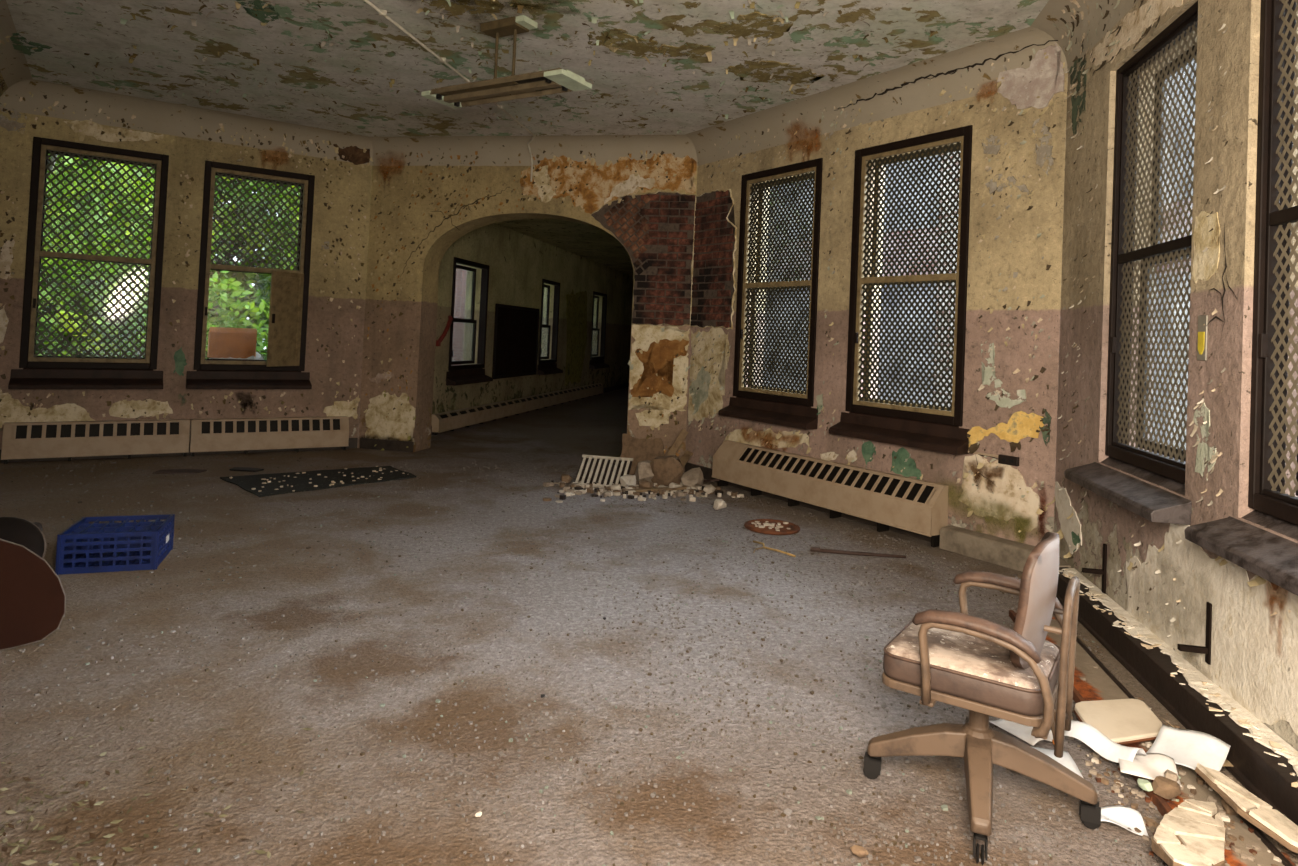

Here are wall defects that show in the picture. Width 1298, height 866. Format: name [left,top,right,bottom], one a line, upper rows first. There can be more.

peeling [158,0,282,33]
peeling [0,80,164,143]
peeling [0,27,419,119]
peeling [416,0,842,134]
crack [834,40,1058,111]
peeling [187,101,933,480]
peeling [0,374,173,428]
flaking render [928,0,1298,788]